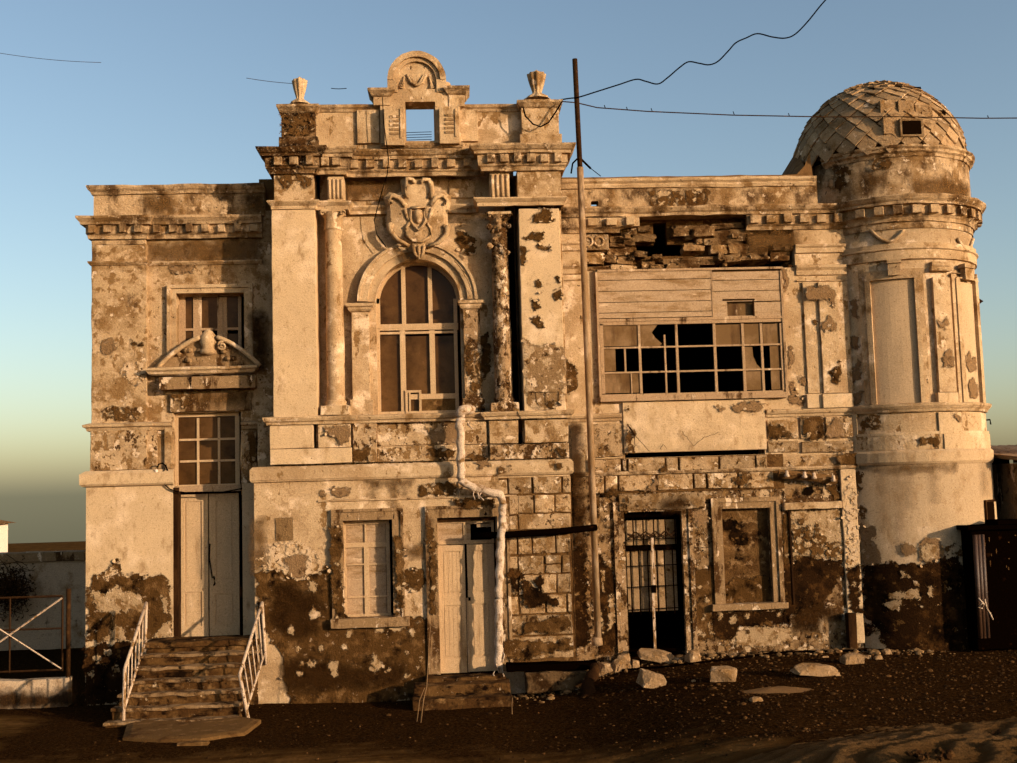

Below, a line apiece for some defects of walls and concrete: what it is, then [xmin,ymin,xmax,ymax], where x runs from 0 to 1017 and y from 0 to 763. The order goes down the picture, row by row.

peeling [519,207,555,266]
peeling [529,275,564,329]
peeling [805,284,837,333]
peeling [99,337,118,358]
peeling [119,361,146,387]
peeling [521,338,568,411]
peeling [101,405,141,422]
peeling [791,450,882,569]
water stain [251,521,438,704]
spalling [691,565,715,641]
peeling [734,625,793,648]
water stain [710,512,974,651]